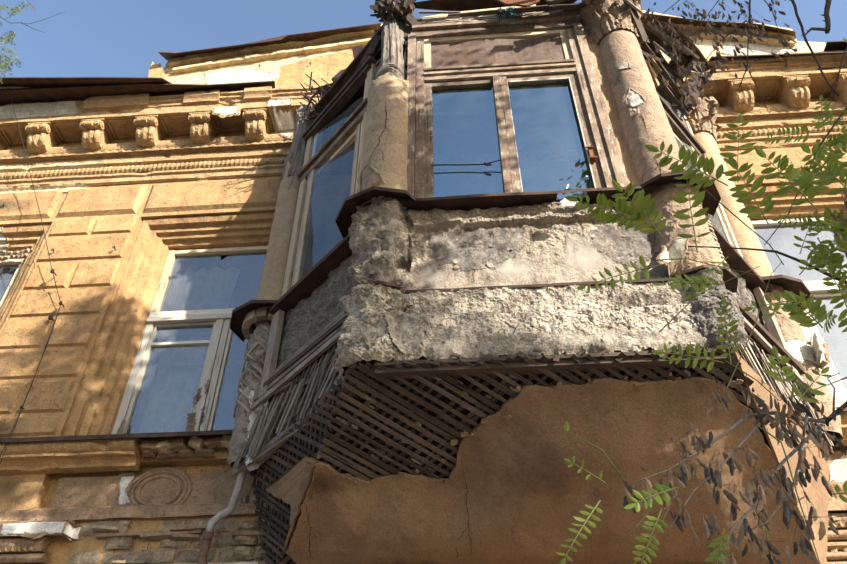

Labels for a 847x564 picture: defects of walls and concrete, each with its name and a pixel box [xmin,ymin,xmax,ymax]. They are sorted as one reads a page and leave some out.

peeling [202,50,354,85]
peeling [212,105,243,118]
peeling [267,96,295,139]
spalling [622,87,648,117]
peeling [185,379,210,432]
spalling [307,372,744,486]
spalling [829,452,847,482]
spalling [115,471,139,506]
spalling [0,516,296,564]